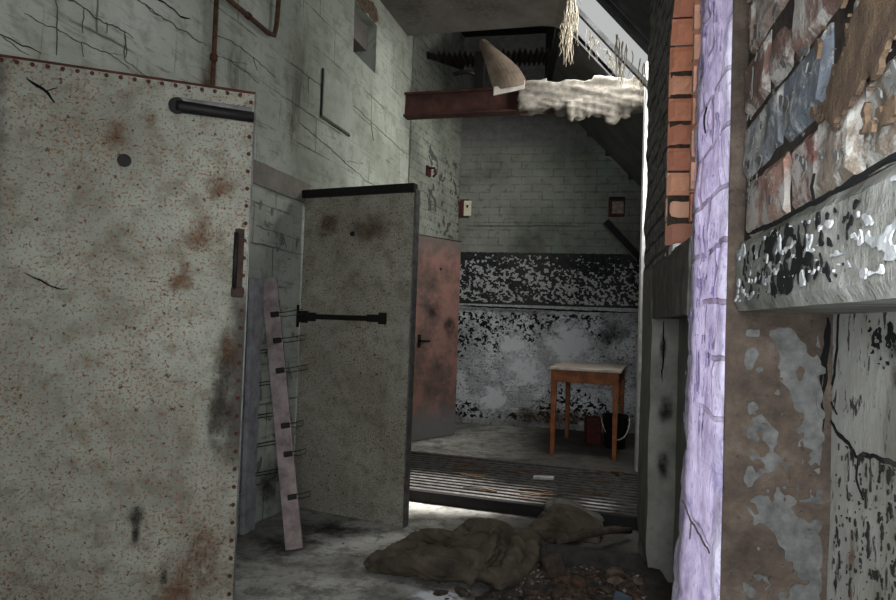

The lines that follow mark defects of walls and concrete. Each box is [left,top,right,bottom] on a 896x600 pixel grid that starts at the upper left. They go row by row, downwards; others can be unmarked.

crack [0,0,146,76]
peeling [743,24,779,205]
crack [746,152,896,236]
spalling [734,199,896,302]
peeling [457,254,640,370]
peeling [455,388,610,424]
crack [816,314,896,500]